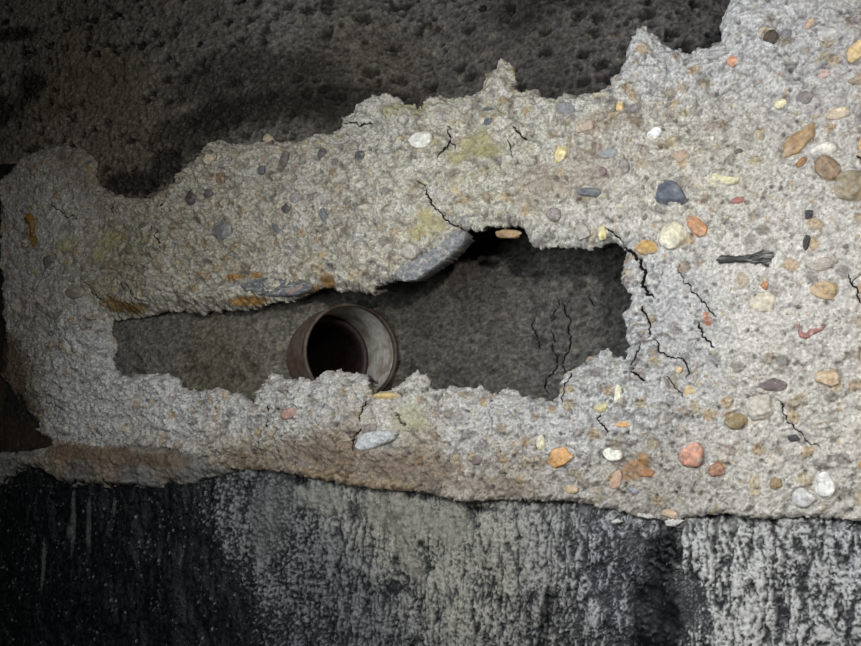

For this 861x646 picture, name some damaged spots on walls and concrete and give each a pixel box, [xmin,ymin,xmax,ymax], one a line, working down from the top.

damp [106,55,383,197]
crack [437,126,456,158]
crack [417,180,467,231]
peeling [395,229,474,282]
peeling [240,278,318,298]
crack [605,227,690,397]
crack [677,264,717,348]
crack [531,298,572,404]
peeling [355,430,399,451]
peeling [665,519,685,527]